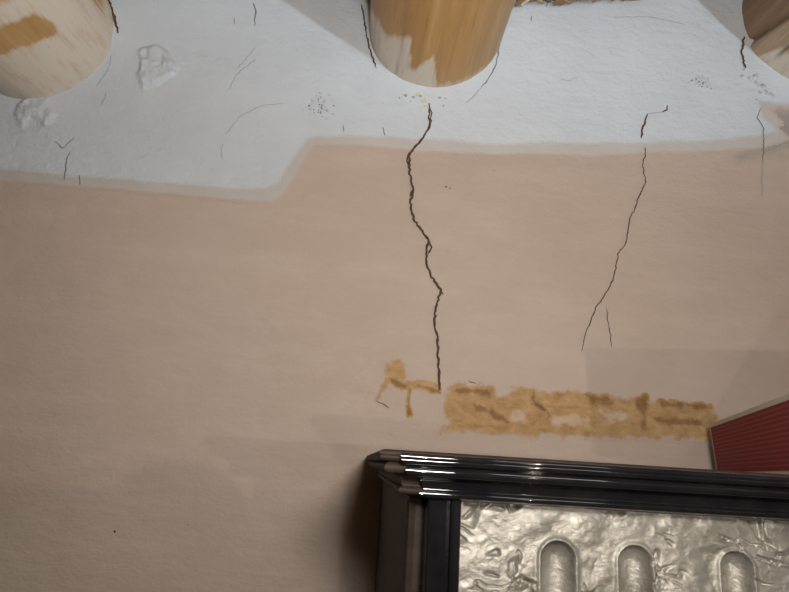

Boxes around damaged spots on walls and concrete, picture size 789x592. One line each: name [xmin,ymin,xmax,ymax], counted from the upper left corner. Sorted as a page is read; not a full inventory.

crack [406,103,443,390]
crack [581,105,668,351]
crack [757,108,765,192]
peeling [433,379,721,444]